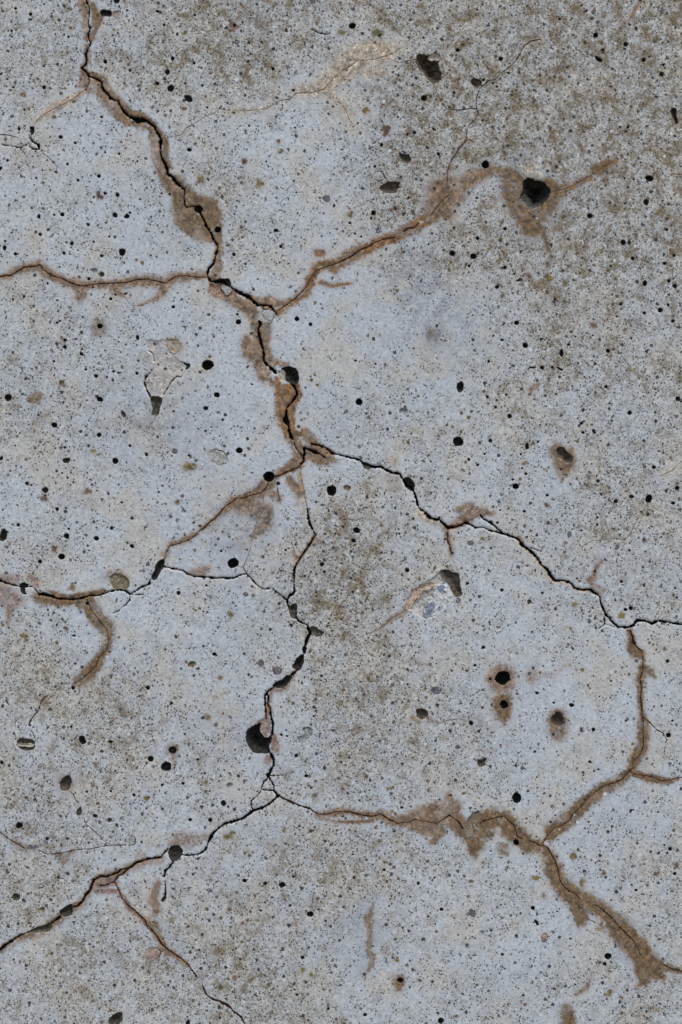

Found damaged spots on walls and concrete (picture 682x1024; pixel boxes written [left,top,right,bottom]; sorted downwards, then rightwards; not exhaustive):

crack [0,0,541,374]
crack [550,108,626,193]
spalling [406,569,463,619]
crack [0,385,682,1024]
water stain [343,882,397,986]